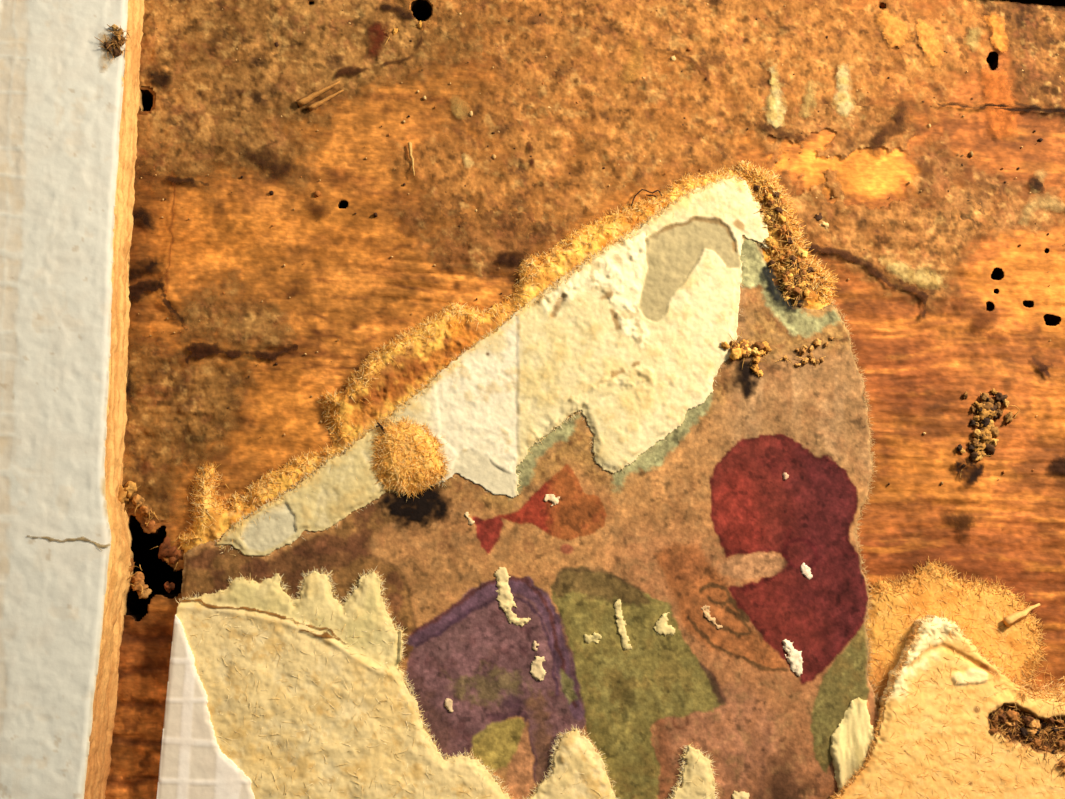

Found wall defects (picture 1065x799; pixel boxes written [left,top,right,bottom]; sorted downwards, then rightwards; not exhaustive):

peeling [214,174,771,558]
leakage [955,460,984,486]
crack [27,535,111,551]